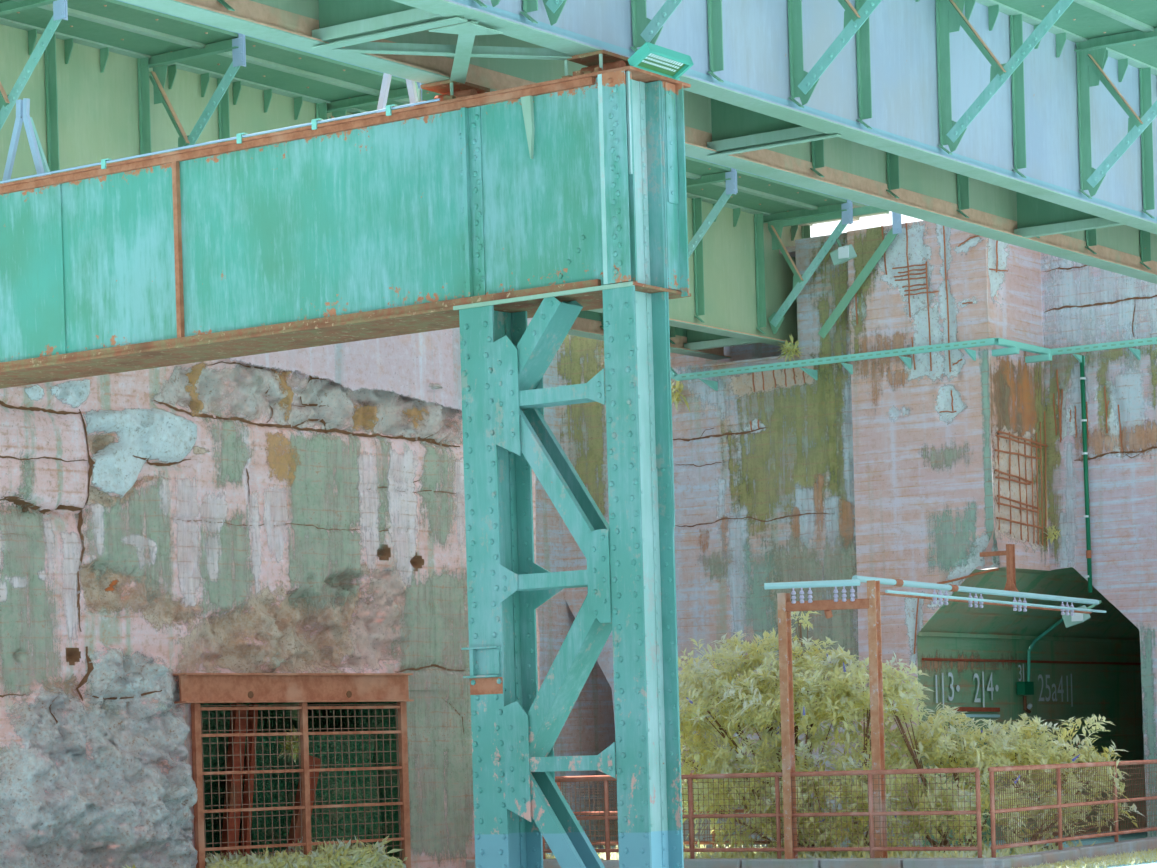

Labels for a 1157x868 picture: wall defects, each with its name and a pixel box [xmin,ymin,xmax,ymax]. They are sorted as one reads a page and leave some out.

spalling [876,221,1010,424]
crack [1044,295,1157,337]
leakage [42,521,81,641]
leakage [89,503,105,556]
spalling [86,475,153,507]
crack [133,455,191,466]
crack [154,361,460,447]
crack [673,427,768,467]
leakage [716,431,753,655]
leakage [795,364,856,550]
spalling [904,369,1128,664]
rust [990,351,1045,442]